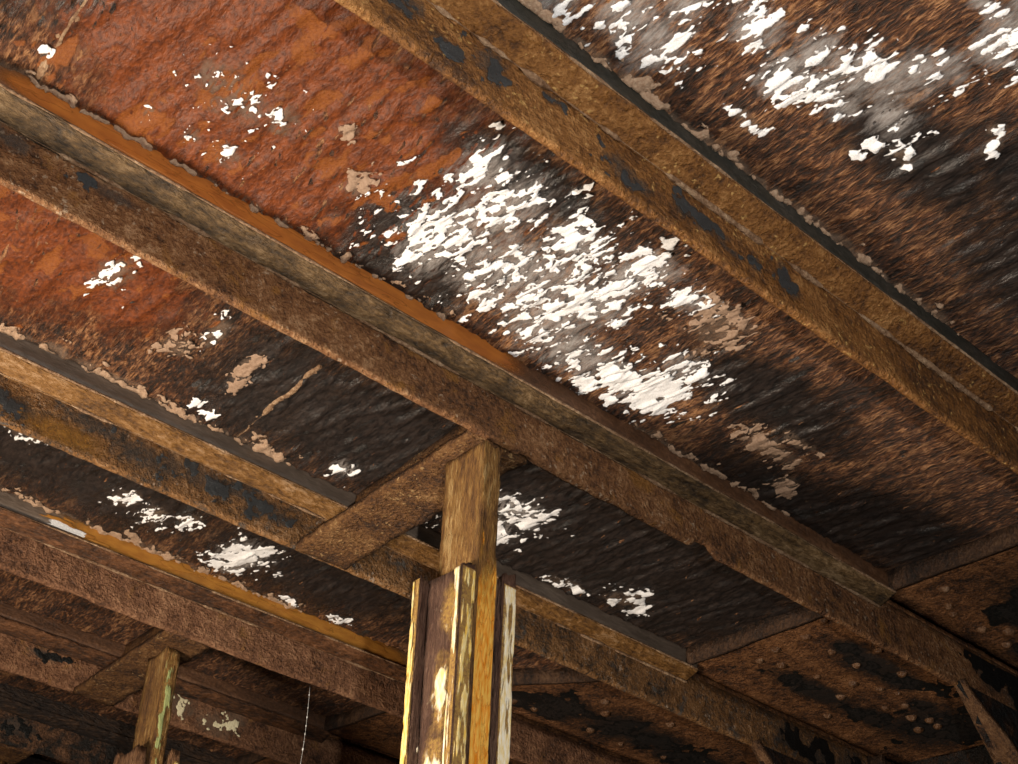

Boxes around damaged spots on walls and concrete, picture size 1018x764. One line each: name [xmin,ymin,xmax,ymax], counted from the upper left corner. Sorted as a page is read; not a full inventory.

corrosion [0,0,514,369]
damp [334,187,466,317]
damp [446,123,606,229]
damp [834,81,1018,321]
damp [0,425,412,636]
damp [180,326,458,495]
peeling [326,614,353,626]
damp [421,511,443,532]
peeling [400,565,476,764]
damp [495,460,803,648]
damp [681,290,976,570]